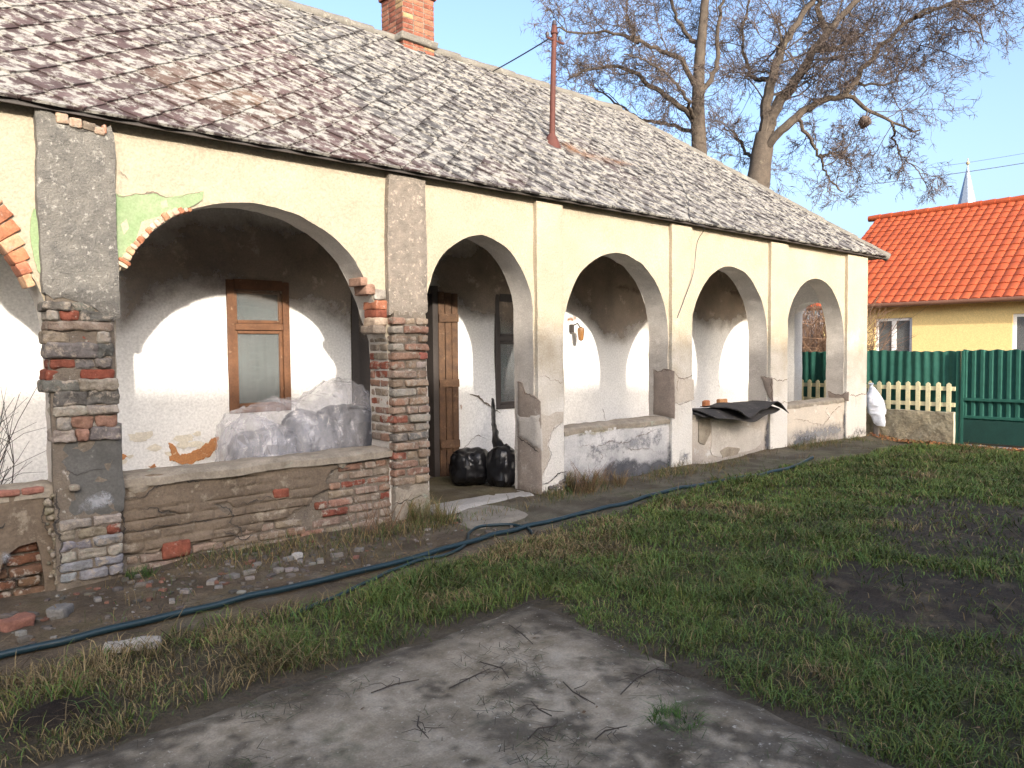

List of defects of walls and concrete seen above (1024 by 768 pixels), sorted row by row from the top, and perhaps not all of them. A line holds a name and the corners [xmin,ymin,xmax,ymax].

spalling [0,199,40,289]
peeling [116,191,204,271]
spalling [37,277,430,583]
spalling [516,381,567,494]
spalling [653,369,694,419]
spalling [0,486,44,498]
crack [121,479,276,540]
spalling [0,542,45,598]